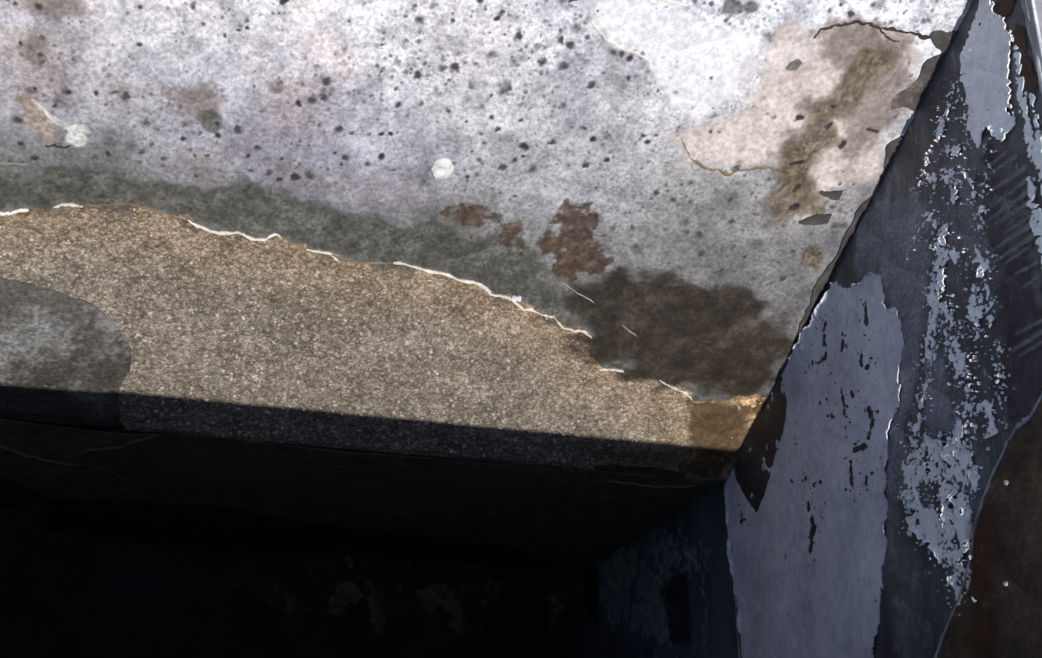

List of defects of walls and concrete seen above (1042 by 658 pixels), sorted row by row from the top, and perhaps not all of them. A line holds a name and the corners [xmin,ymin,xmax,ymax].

peeling [586,0,958,225]
crack [814,19,931,42]
corrosion [994,0,1038,103]
leakage [0,166,797,396]
spalling [0,198,904,658]
corrosion [441,199,614,280]
peeling [897,0,1042,658]
corrosion [937,145,1042,658]